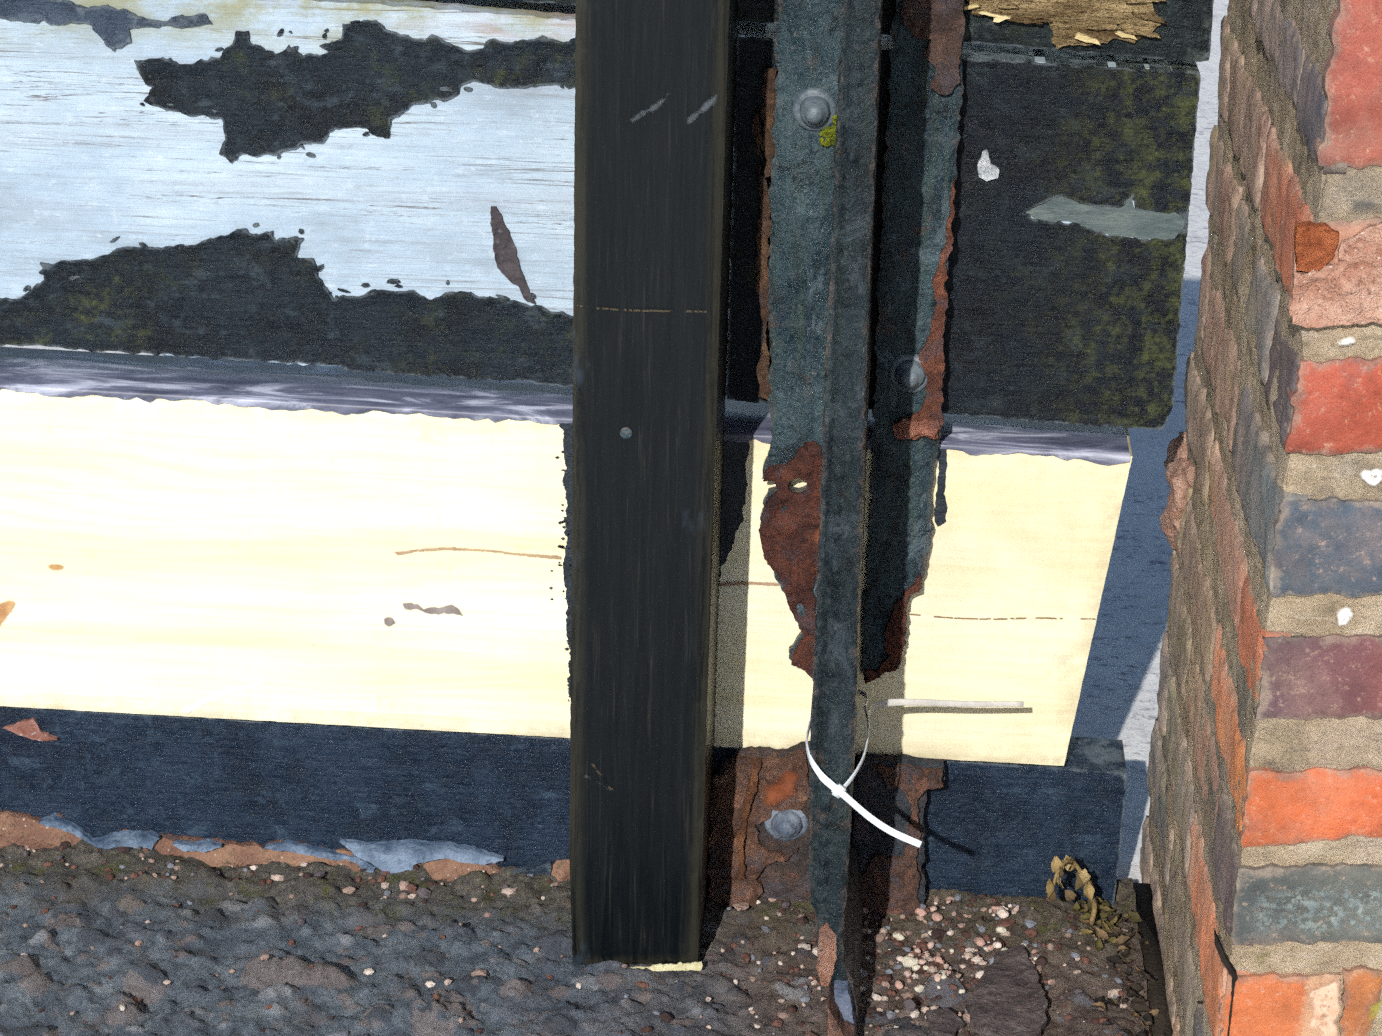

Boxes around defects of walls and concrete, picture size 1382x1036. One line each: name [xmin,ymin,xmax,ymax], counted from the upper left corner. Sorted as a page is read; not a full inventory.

peeling [0,0,213,51]
peeling [134,20,576,163]
corrosion [901,0,965,95]
peeling [0,206,573,387]
corrosion [892,175,956,440]
spalling [1287,221,1382,328]
corrosion [759,441,823,678]
peeling [0,809,570,882]
corrosion [708,749,810,907]
corrosion [816,922,837,986]
crack [1214,929,1238,1036]
peeling [1305,981,1340,1036]